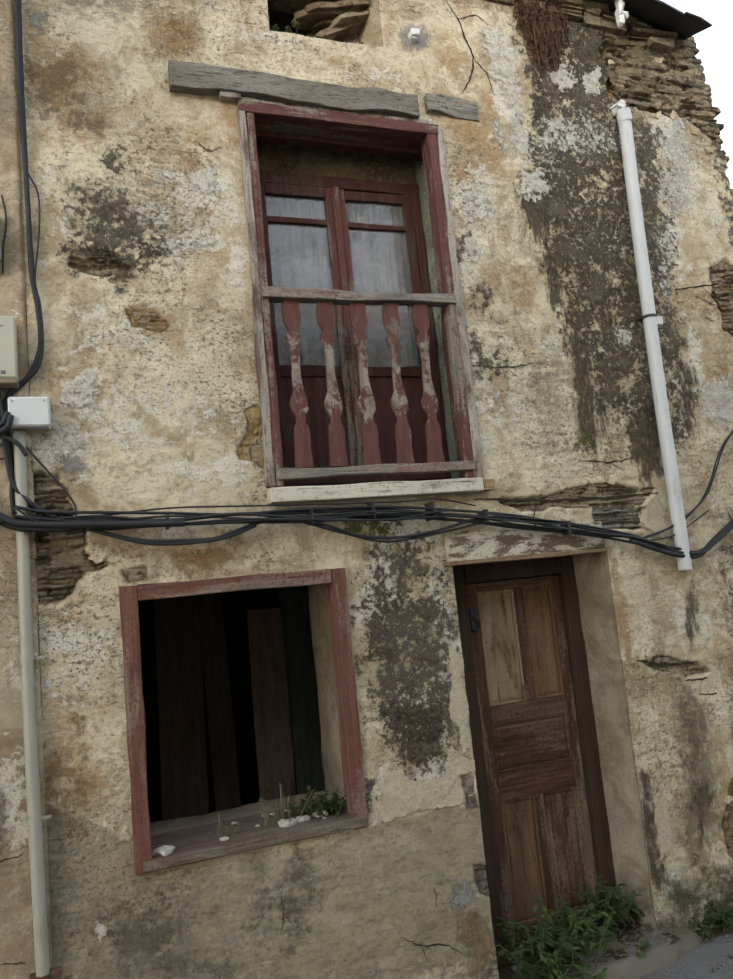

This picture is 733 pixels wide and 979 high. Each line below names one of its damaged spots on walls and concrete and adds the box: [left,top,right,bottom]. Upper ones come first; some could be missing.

damp [23,52,104,138]
crack [446,0,494,94]
spalling [68,241,127,278]
damp [56,144,181,296]
damp [508,15,699,489]
spalling [547,17,725,298]
spalling [705,256,733,334]
damp [713,148,733,246]
spalling [32,418,107,605]
spalling [498,479,674,539]
damp [350,521,470,781]
crack [401,937,464,961]